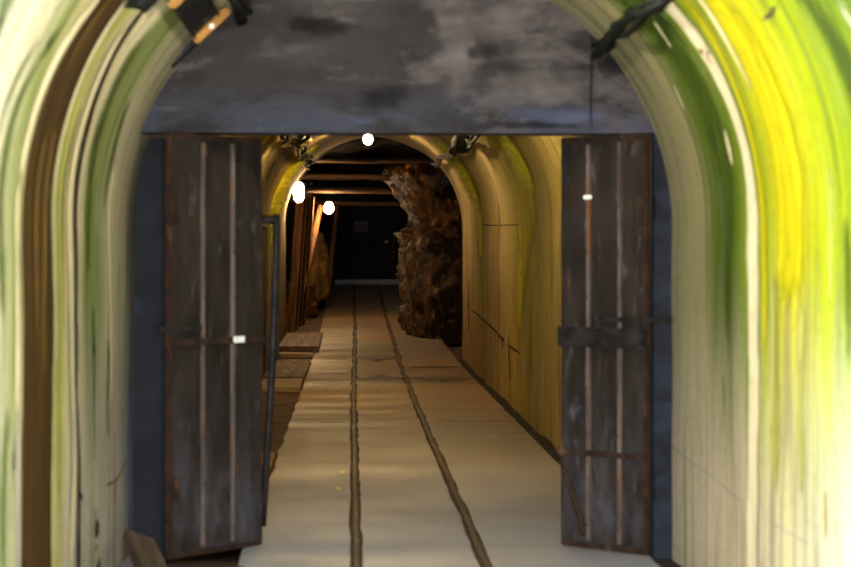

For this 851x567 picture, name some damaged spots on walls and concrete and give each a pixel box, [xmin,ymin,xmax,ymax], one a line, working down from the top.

leakage [0,0,99,411]
leakage [53,1,143,567]
leakage [640,0,802,567]
leakage [802,0,851,93]
leakage [2,416,20,567]